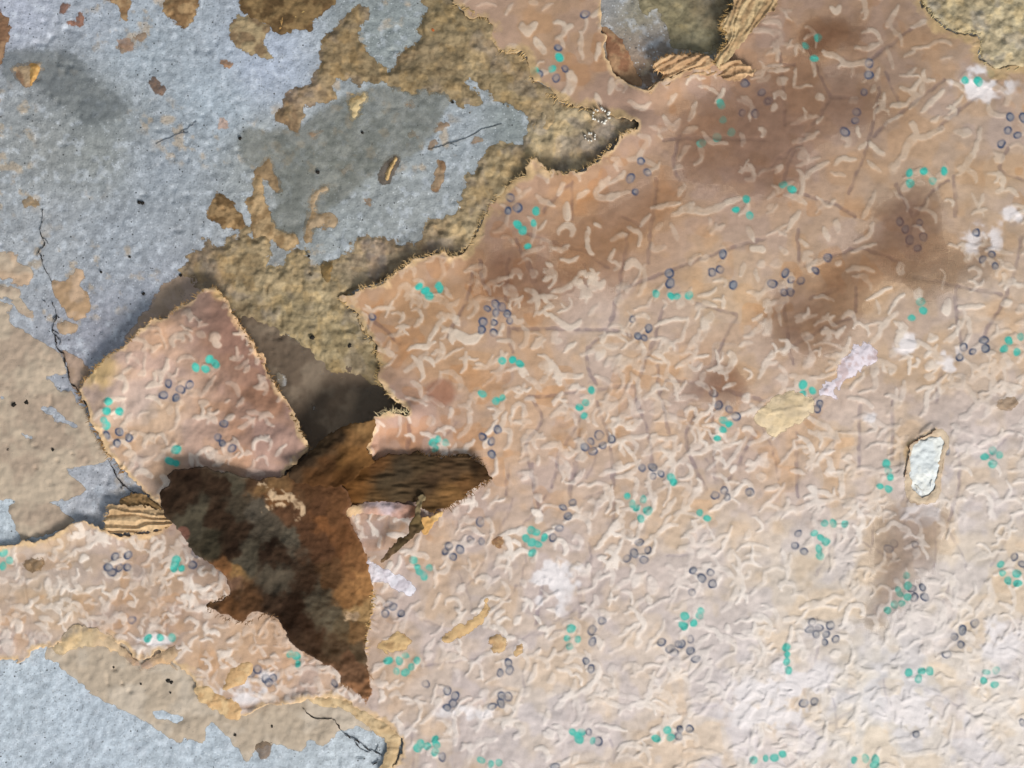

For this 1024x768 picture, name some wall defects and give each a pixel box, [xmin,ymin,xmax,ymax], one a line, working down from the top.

peeling [29,63,40,86]
peeling [584,107,611,142]
spalling [377,154,400,185]
crack [38,210,86,405]
spalling [904,429,949,505]
crack [302,707,382,765]